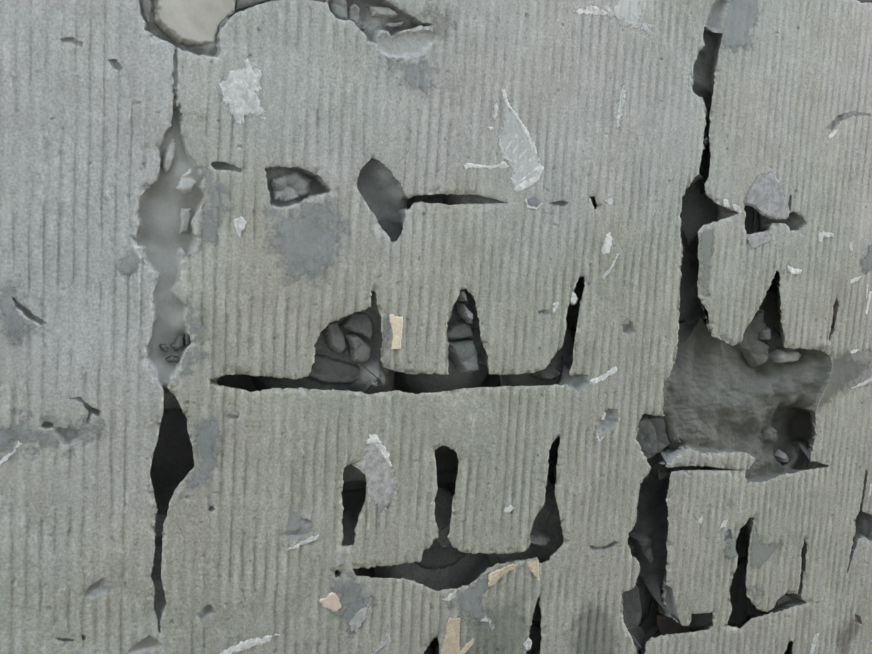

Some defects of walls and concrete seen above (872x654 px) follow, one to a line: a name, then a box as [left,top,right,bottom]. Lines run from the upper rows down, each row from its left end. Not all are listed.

spalling [375,29,436,58]
crack [690,27,723,195]
crack [406,194,504,210]
spalling [662,271,832,483]
spalling [342,506,363,546]
spalling [353,436,564,591]
crack [847,470,872,573]
peeling [654,581,680,621]